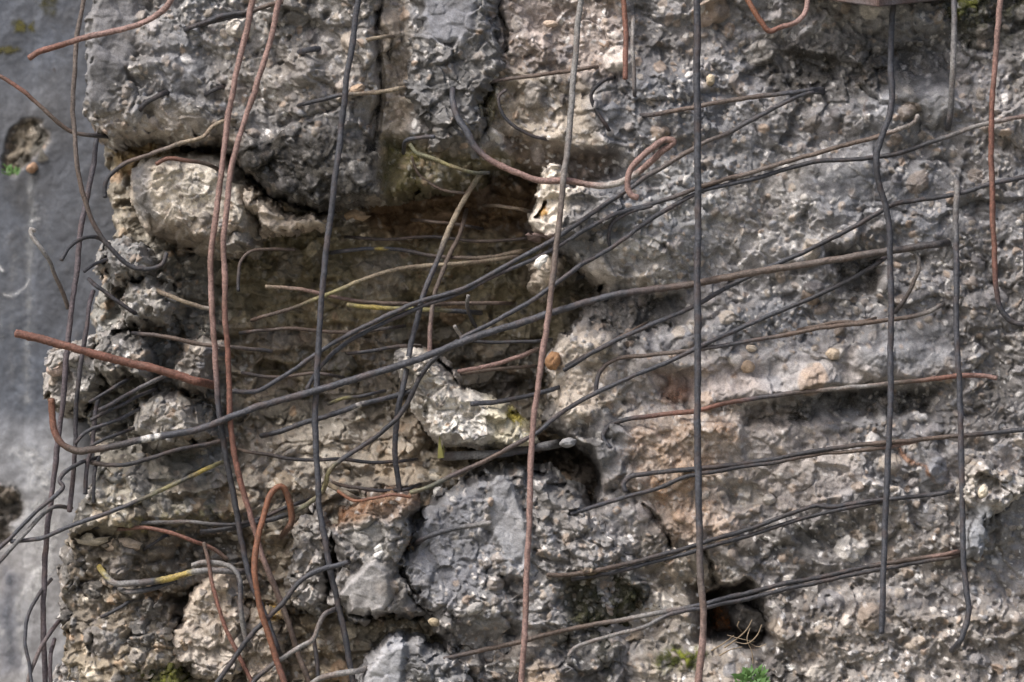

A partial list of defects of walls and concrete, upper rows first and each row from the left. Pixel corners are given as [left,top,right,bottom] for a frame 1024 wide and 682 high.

spalling [0,0,561,682]
crack [363,7,393,151]
spalling [329,0,951,682]